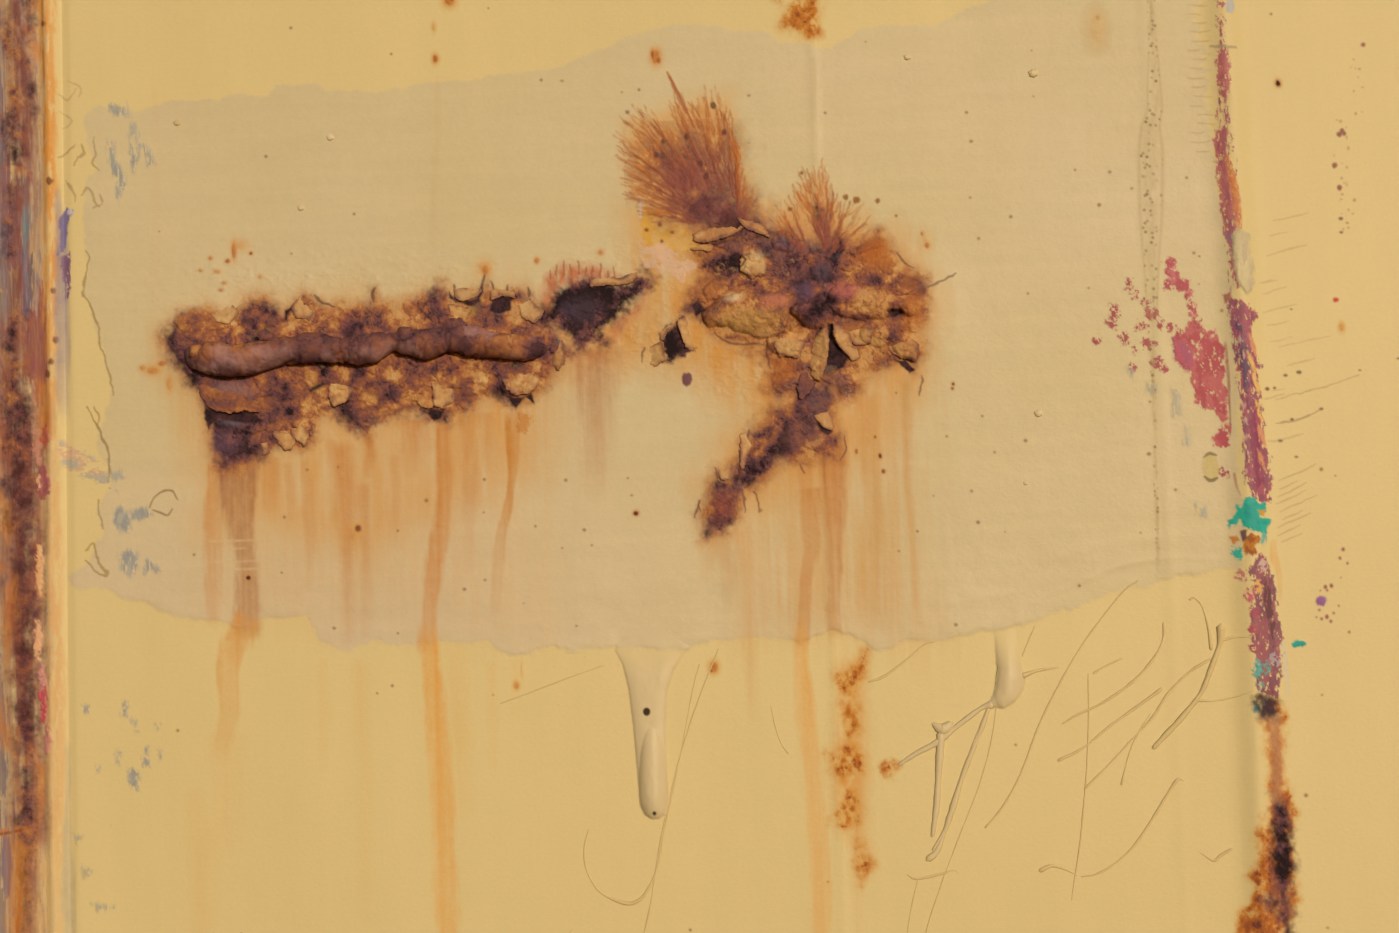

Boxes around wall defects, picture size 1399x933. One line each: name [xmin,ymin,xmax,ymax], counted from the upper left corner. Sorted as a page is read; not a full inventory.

corrosion [767,0,832,45]
corrosion [0,0,72,933]
corrosion [135,41,964,933]
spalling [684,364,854,553]
corrosion [1229,682,1305,933]